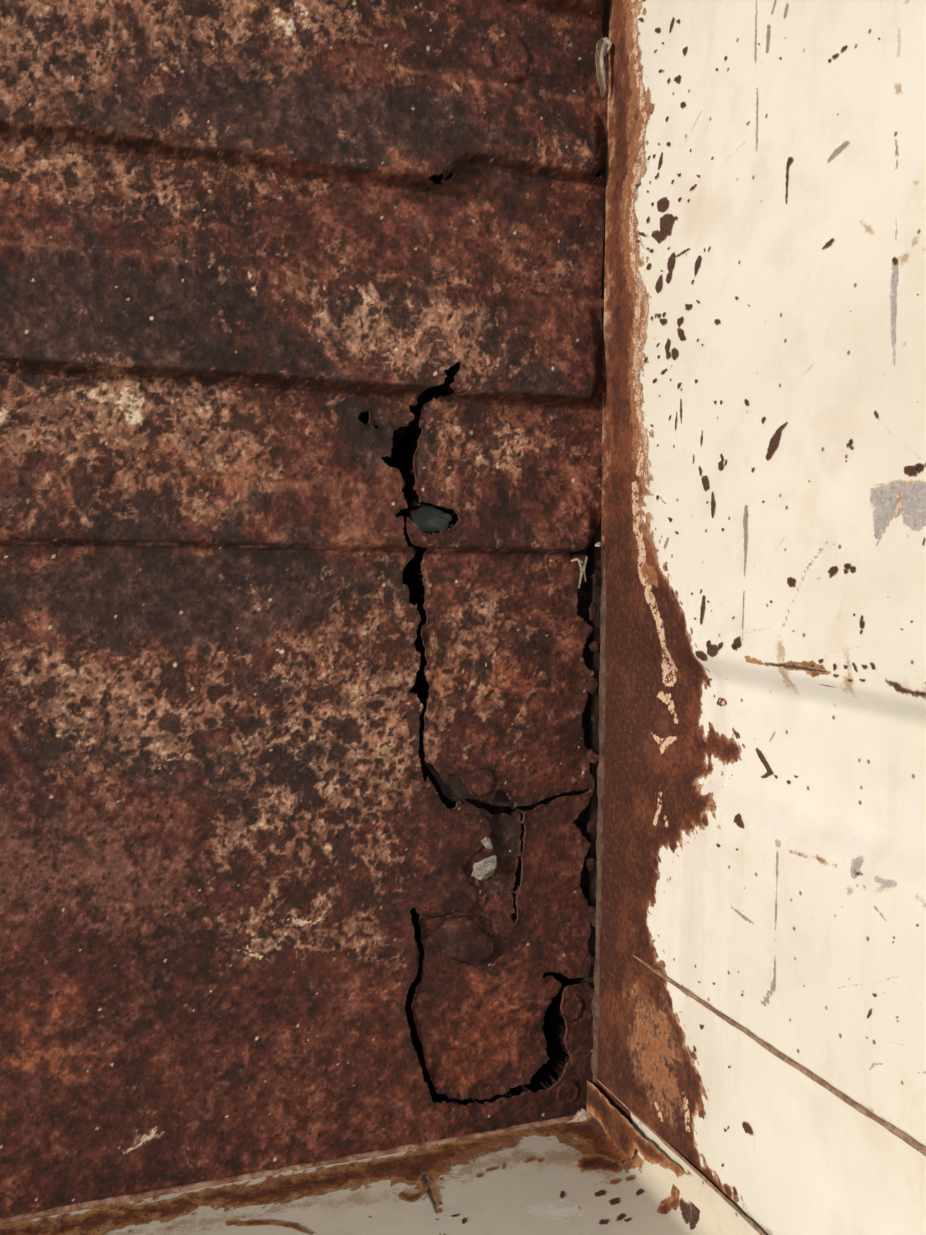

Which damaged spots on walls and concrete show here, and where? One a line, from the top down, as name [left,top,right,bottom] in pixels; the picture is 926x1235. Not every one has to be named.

rust [890,254,908,364]
peeling [870,458,926,546]
crack [381,361,591,922]
rust [570,547,598,621]
rust [597,0,747,1209]
rust [744,643,875,692]
rust [885,680,926,699]
rust [417,813,492,918]
rust [572,809,597,837]
crack [405,907,588,1106]
rust [0,1081,691,1235]
rust [657,1184,700,1230]